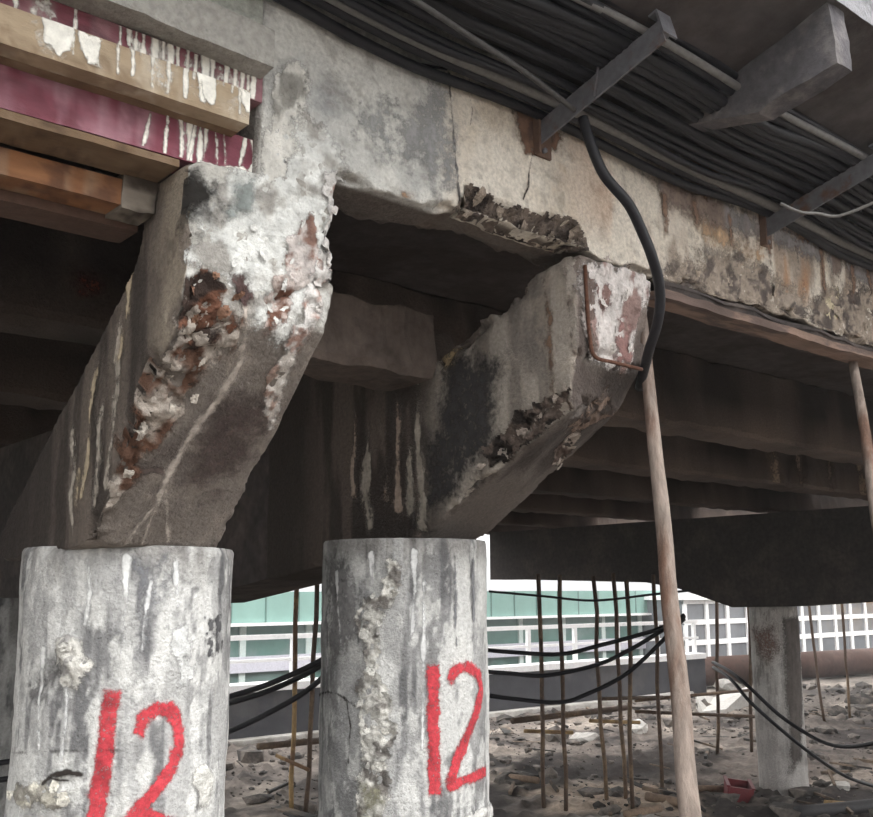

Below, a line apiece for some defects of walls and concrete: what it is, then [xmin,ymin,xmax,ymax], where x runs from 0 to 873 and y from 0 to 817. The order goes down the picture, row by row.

crack [448,73,471,201]
peeling [105,60,350,508]
rust [285,212,324,291]
spalling [450,183,589,253]
rust [567,271,612,356]
peeling [574,256,651,373]
rust [615,315,634,363]
leakage [68,272,134,528]
leakage [384,402,428,532]
leakage [122,553,179,648]
crack [319,690,355,764]
peeling [354,558,402,817]